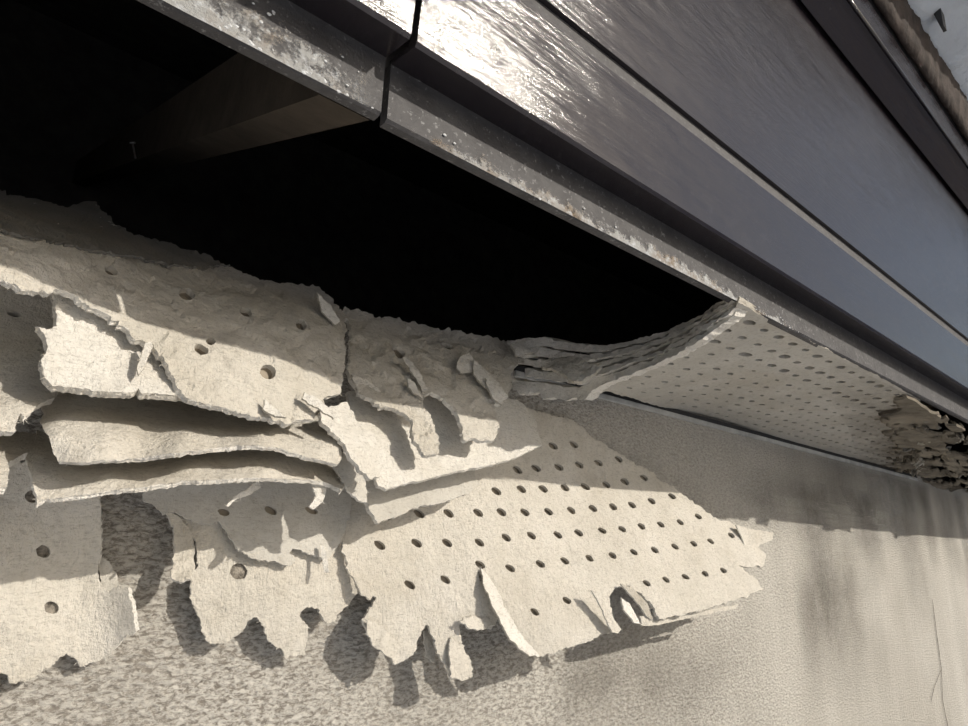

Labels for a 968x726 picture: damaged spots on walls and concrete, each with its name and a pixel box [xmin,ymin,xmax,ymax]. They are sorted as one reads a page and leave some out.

damp [163,0,354,99]
damp [440,133,790,328]
peeling [301,392,382,504]
peeling [308,484,327,510]
peeling [0,461,140,684]
peeling [166,513,195,584]
peeling [340,542,377,600]
peeling [366,619,400,665]
peeling [448,637,473,681]
peeling [459,615,495,631]
peeling [590,590,621,634]
peeling [620,584,739,626]